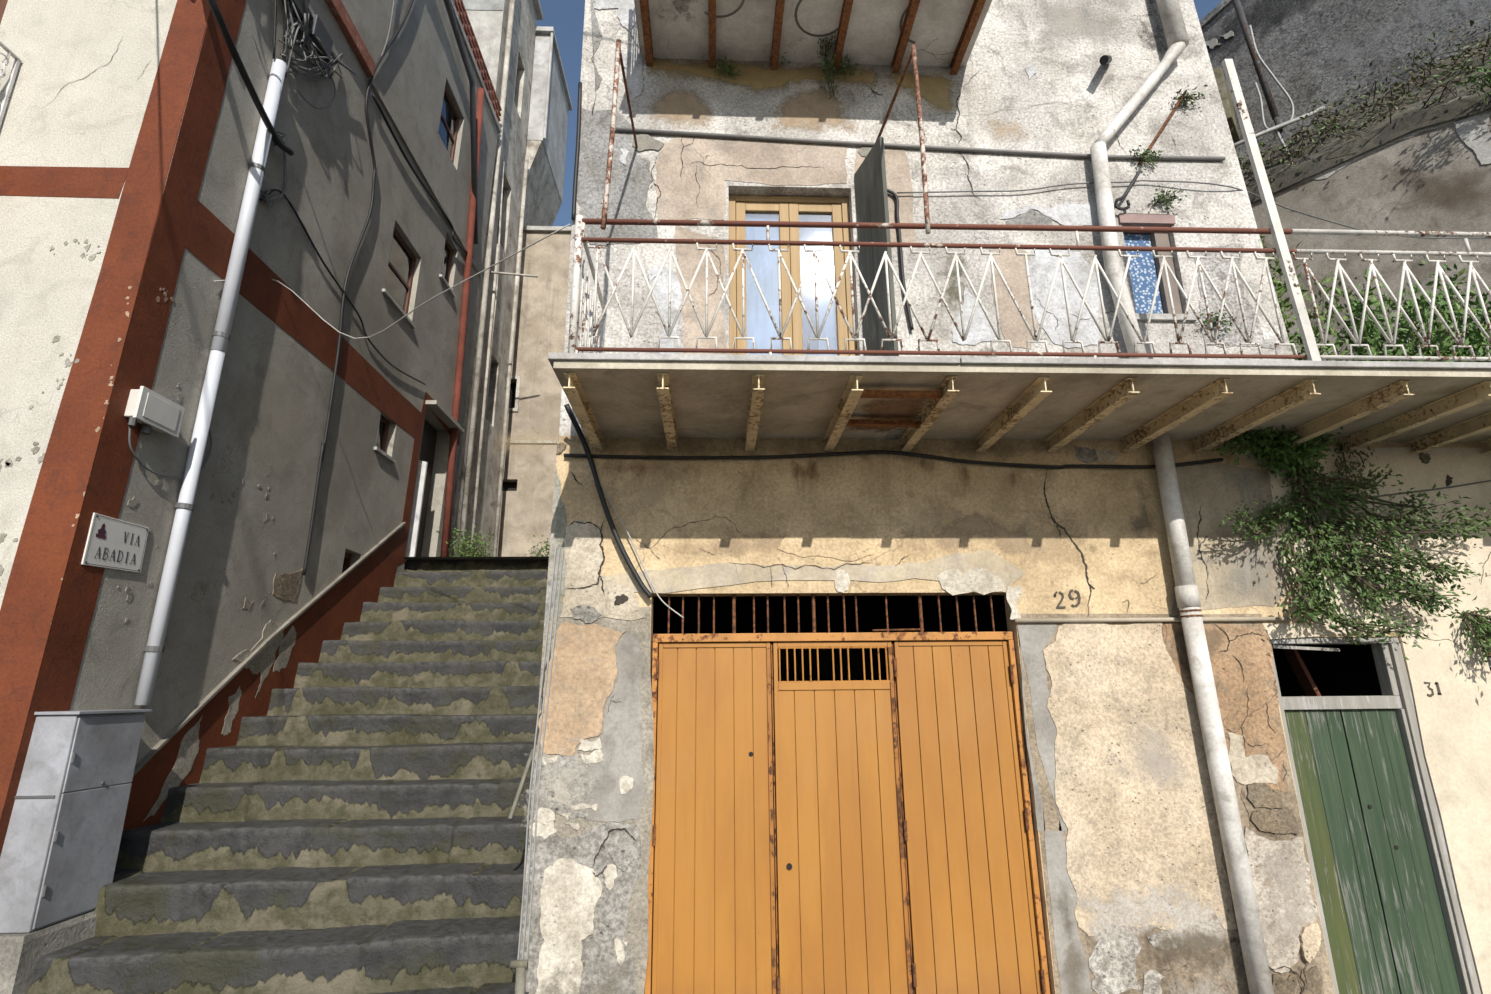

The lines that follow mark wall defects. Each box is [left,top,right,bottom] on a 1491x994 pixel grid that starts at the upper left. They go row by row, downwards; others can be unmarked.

water stain [649,59,953,129]
peeling [573,0,866,354]
peeling [884,149,917,243]
peeling [1283,109,1491,189]
spalling [273,568,303,602]
crack [567,515,911,595]
crack [1043,469,1156,616]
peeling [143,715,203,822]
peeling [221,620,297,736]
peeling [520,436,1250,994]
peeling [1175,462,1324,994]